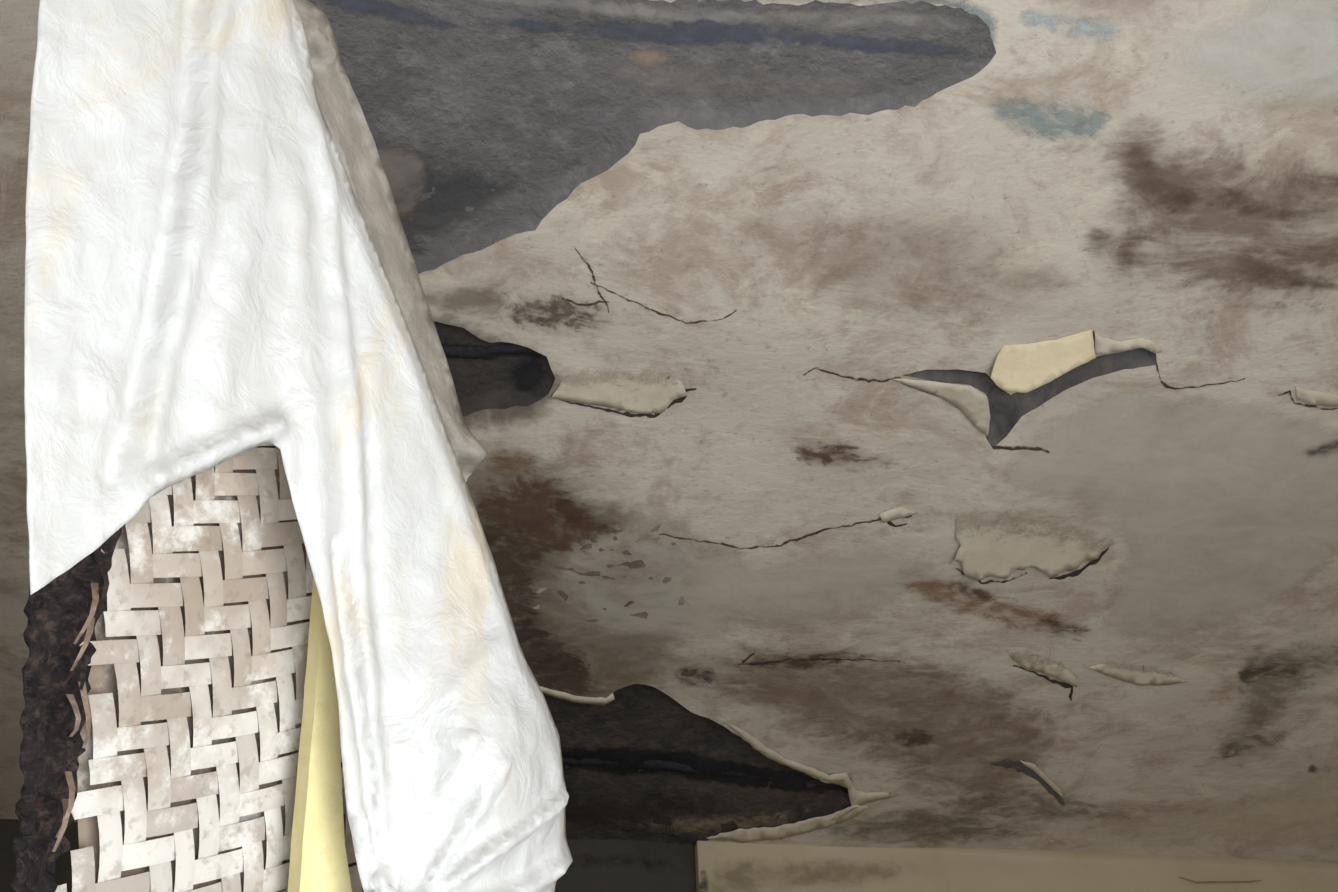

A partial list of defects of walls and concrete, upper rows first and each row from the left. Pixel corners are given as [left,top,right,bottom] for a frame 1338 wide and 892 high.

spalling [308,0,996,274]
water stain [1117,142,1338,291]
crack [562,248,737,324]
spalling [434,321,697,418]
peeling [842,329,1246,453]
rust [477,450,621,552]
crack [659,507,918,549]
peeling [954,518,1110,584]
rust [910,582,1087,632]
spalling [539,684,892,846]
crack [990,759,1065,806]